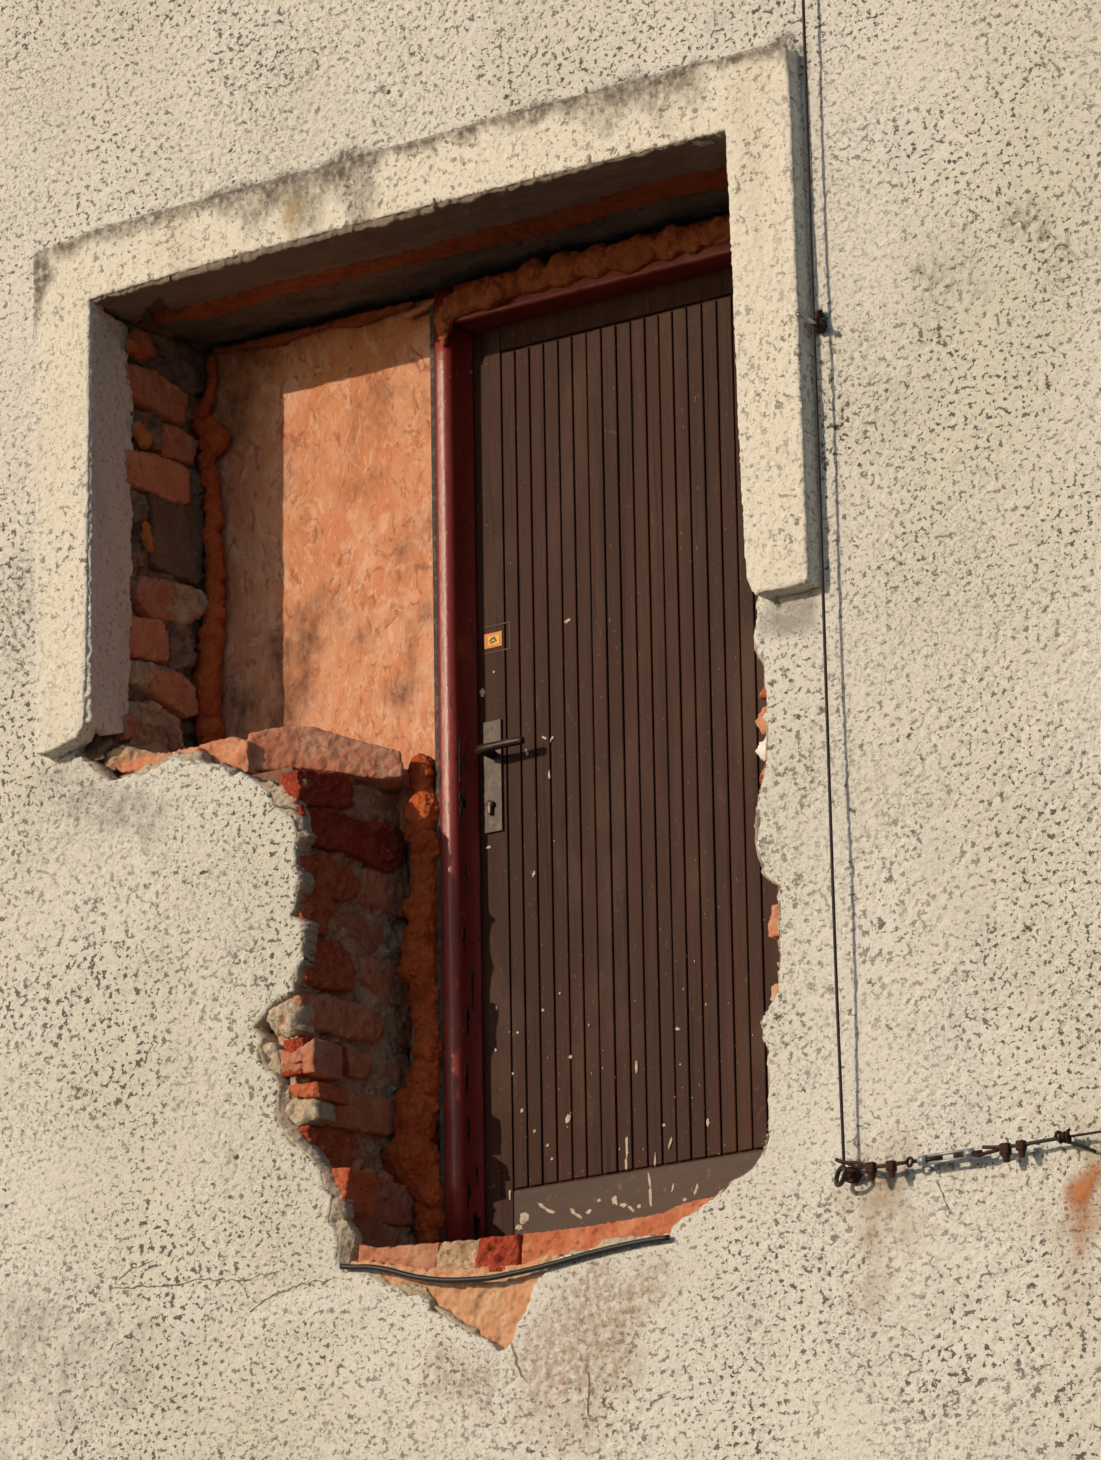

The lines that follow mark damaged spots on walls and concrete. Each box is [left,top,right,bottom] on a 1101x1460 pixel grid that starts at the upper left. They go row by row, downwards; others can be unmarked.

flaking render [78,309,770,1351]
flaking render [754,639,782,1097]
corrosion [1069,1167,1098,1204]